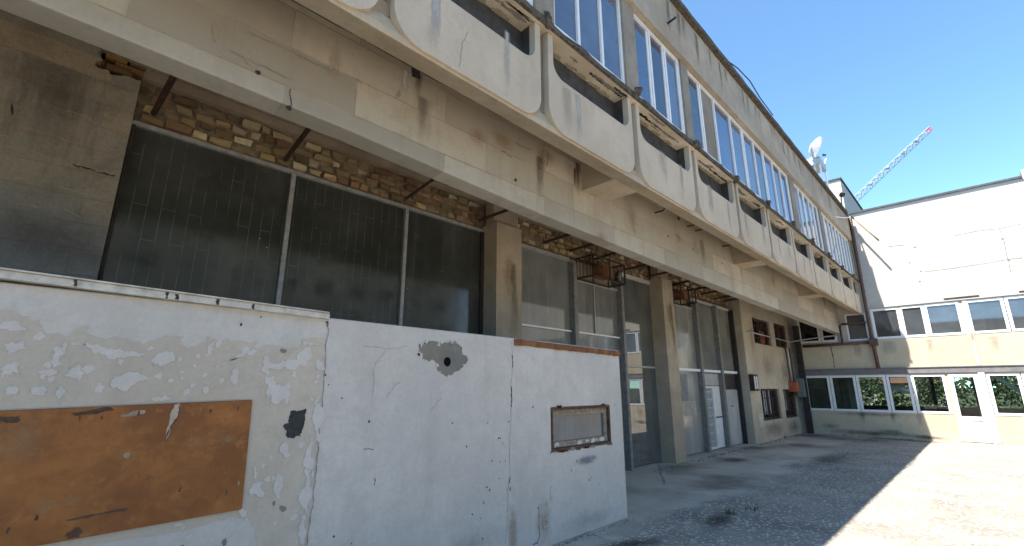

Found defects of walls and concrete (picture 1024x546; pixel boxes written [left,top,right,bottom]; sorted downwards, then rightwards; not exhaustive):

peeling [0,309,329,546]